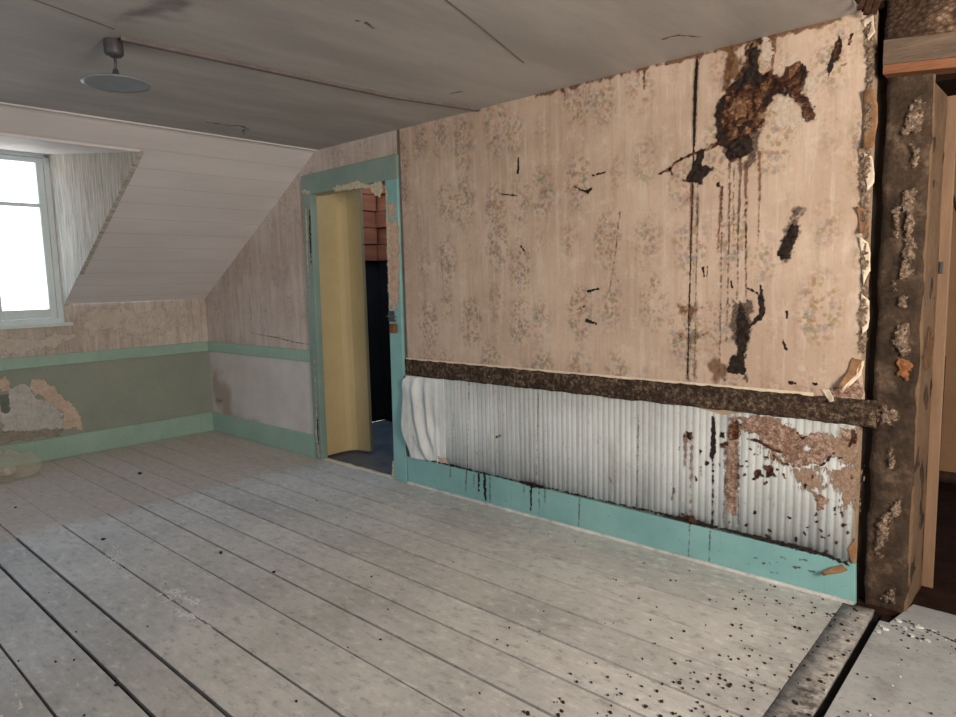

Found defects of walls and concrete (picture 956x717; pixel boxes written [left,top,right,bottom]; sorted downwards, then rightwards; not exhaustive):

leakage [536,18,842,343]
peeling [897,357,913,381]
peeling [0,376,83,445]